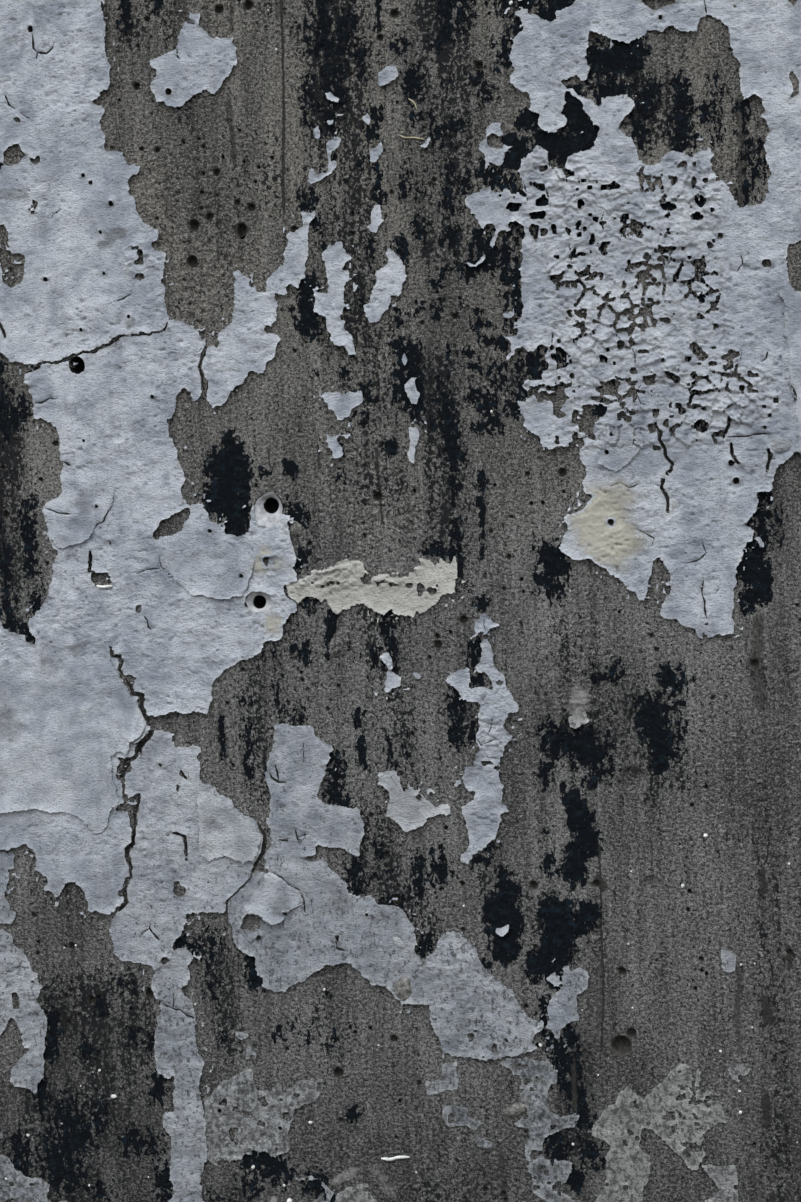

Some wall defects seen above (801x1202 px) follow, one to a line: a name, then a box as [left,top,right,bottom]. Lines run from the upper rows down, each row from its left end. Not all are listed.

crack [568,212,622,260]
crack [27,319,170,373]
peeling [464,0,801,642]
crack [720,352,768,383]
peeling [0,0,589,1202]
crack [110,646,153,911]
peeling [721,948,755,972]
peeling [728,1062,750,1092]
peeling [592,1064,742,1202]